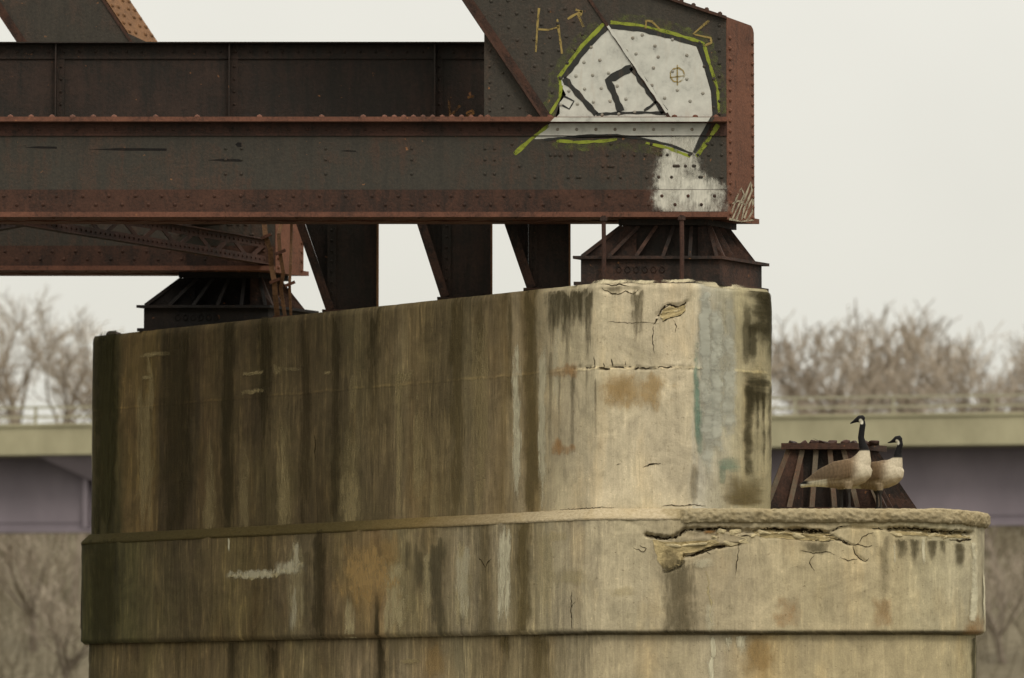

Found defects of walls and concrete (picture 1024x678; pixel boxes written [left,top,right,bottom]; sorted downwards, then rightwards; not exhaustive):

water stain [548,287,592,338]
spalling [652,302,686,350]
water stain [749,291,772,355]
crack [574,357,723,371]
water stain [745,376,772,472]
water stain [727,483,760,504]
spalling [634,526,850,573]
spalling [872,527,971,545]